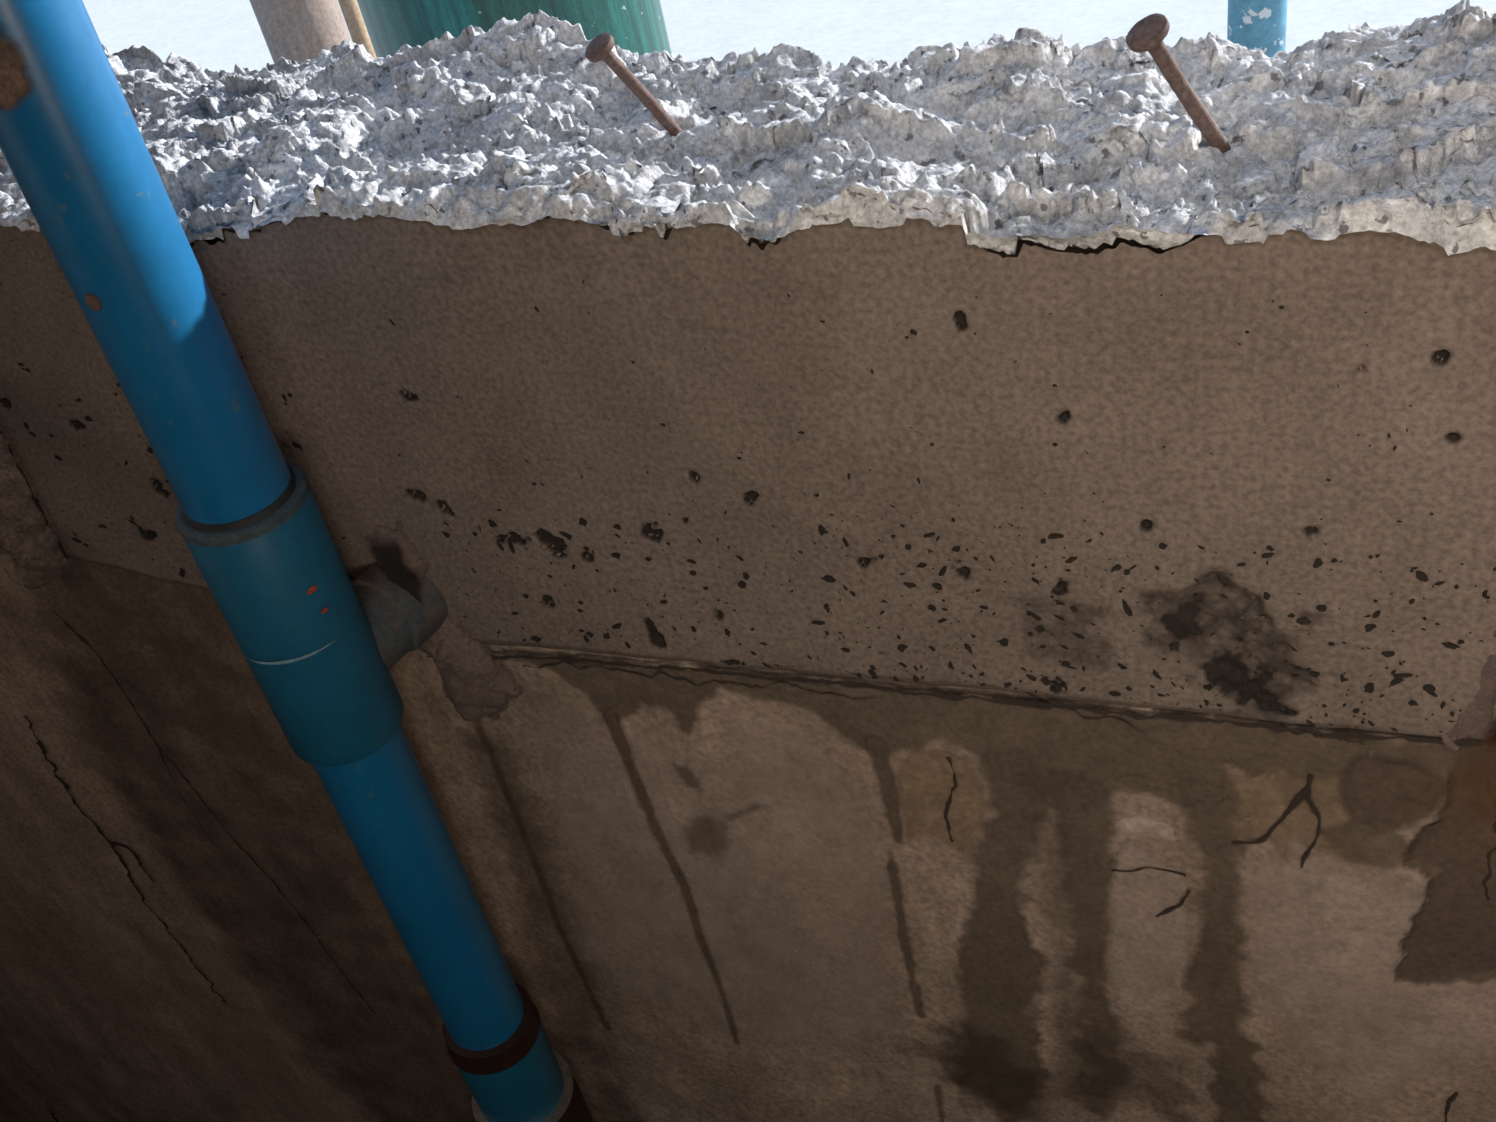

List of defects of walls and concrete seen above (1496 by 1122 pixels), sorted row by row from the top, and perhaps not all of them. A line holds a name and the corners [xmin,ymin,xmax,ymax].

spalling [0,150,40,232]
spalling [102,0,1496,256]
crack [24,611,377,1014]
leakage [514,654,1387,1122]
spalling [1232,632,1496,984]